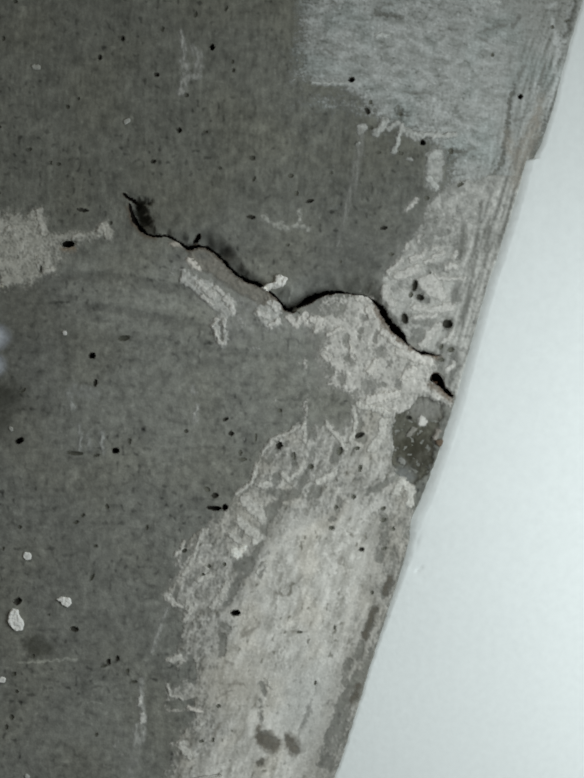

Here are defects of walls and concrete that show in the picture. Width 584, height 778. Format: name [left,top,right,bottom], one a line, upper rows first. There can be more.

crack [122,192,454,398]